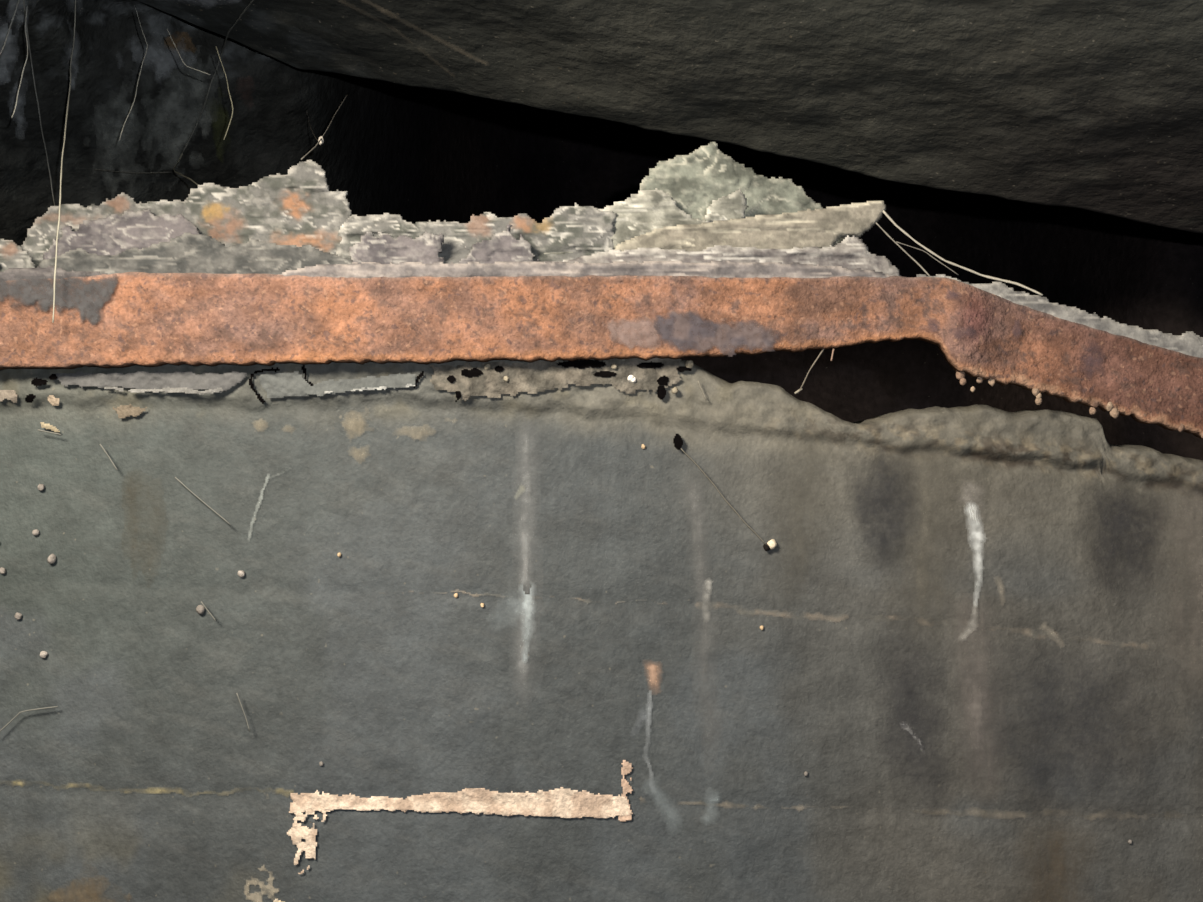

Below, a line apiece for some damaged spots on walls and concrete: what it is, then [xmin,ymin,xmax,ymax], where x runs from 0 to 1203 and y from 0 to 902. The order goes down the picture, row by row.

corrosion [0,142,901,281]
corrosion [916,274,1203,358]
corrosion [956,371,996,392]
corrosion [1032,388,1042,405]
corrosion [1080,398,1119,418]
damp [961,491,983,638]
damp [964,662,988,759]
peeling [287,760,633,874]
peeling [245,877,281,902]